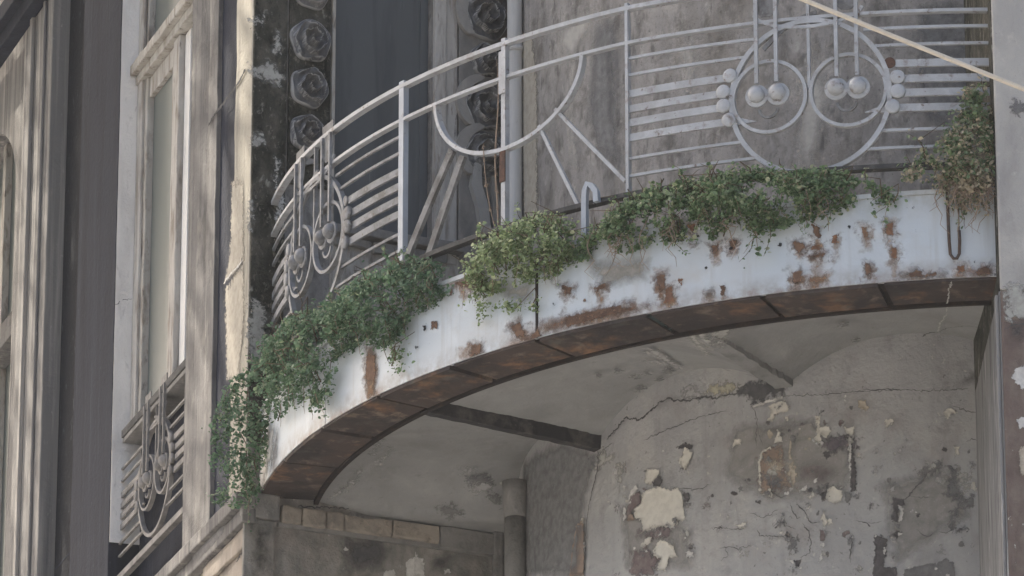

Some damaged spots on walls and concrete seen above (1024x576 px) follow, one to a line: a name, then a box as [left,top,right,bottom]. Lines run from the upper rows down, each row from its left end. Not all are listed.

corrosion [788,224,840,289]
corrosion [507,271,683,339]
corrosion [363,346,378,395]
corrosion [463,343,481,357]
crack [789,388,976,413]
peeling [1011,366,1024,389]
water stain [624,513,689,566]
peeling [607,468,714,576]
peeling [662,442,693,470]
water stain [729,421,850,497]
spalling [717,396,955,576]
water stain [887,474,965,557]